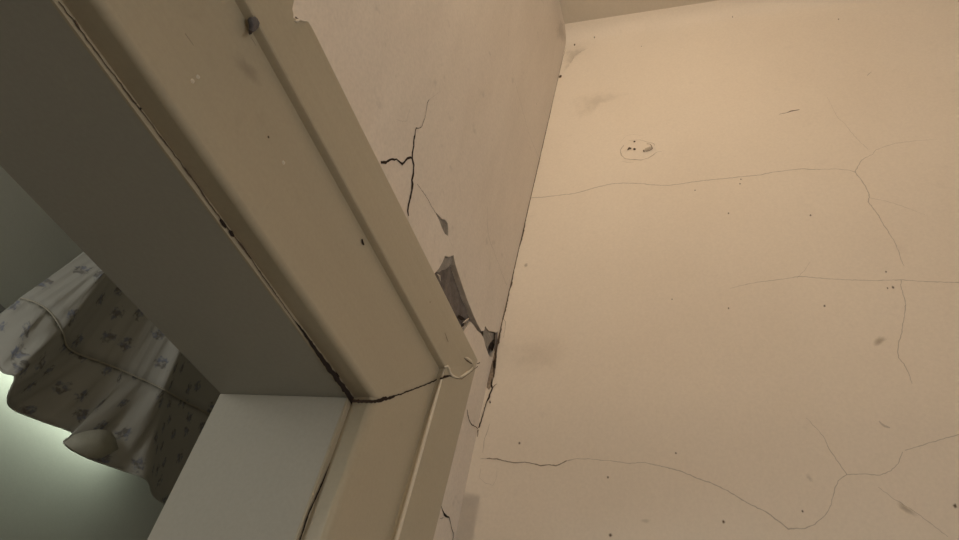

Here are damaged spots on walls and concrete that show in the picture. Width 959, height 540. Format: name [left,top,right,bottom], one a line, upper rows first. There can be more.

crack [353,51,565,437]
spalling [435,255,498,389]